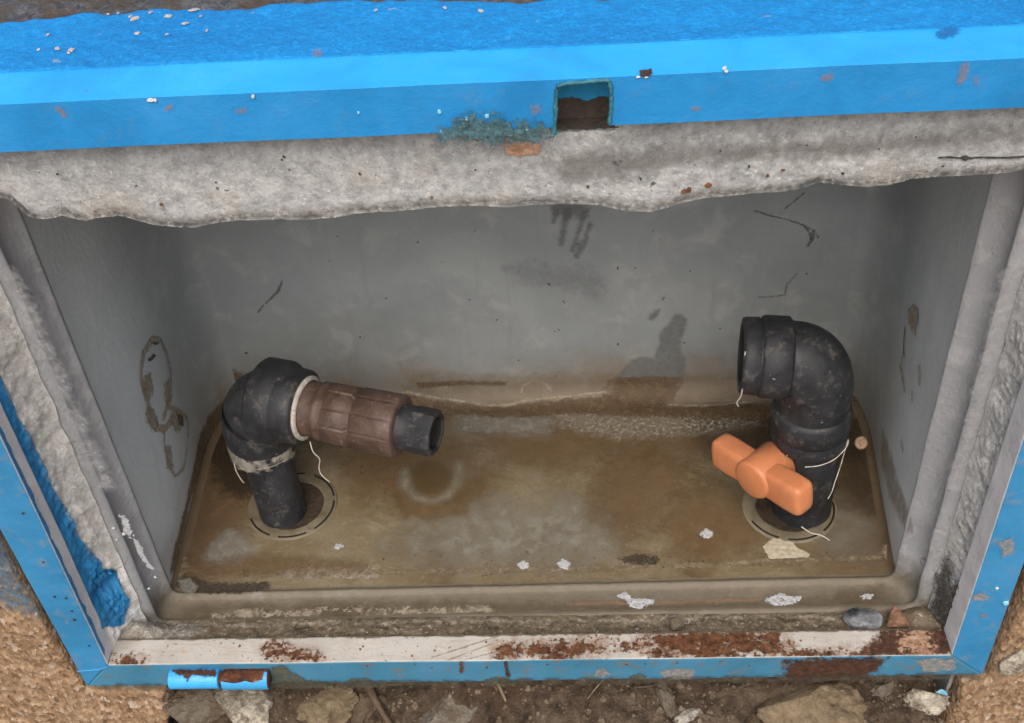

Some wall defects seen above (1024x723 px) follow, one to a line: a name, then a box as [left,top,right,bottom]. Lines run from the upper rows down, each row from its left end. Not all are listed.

crack [754,193,819,246]
leakage [405,316,772,449]
leakage [840,418,873,509]
leakage [170,402,643,580]
leakage [656,554,883,569]
corrosion [251,639,326,663]
corrosion [485,629,951,683]